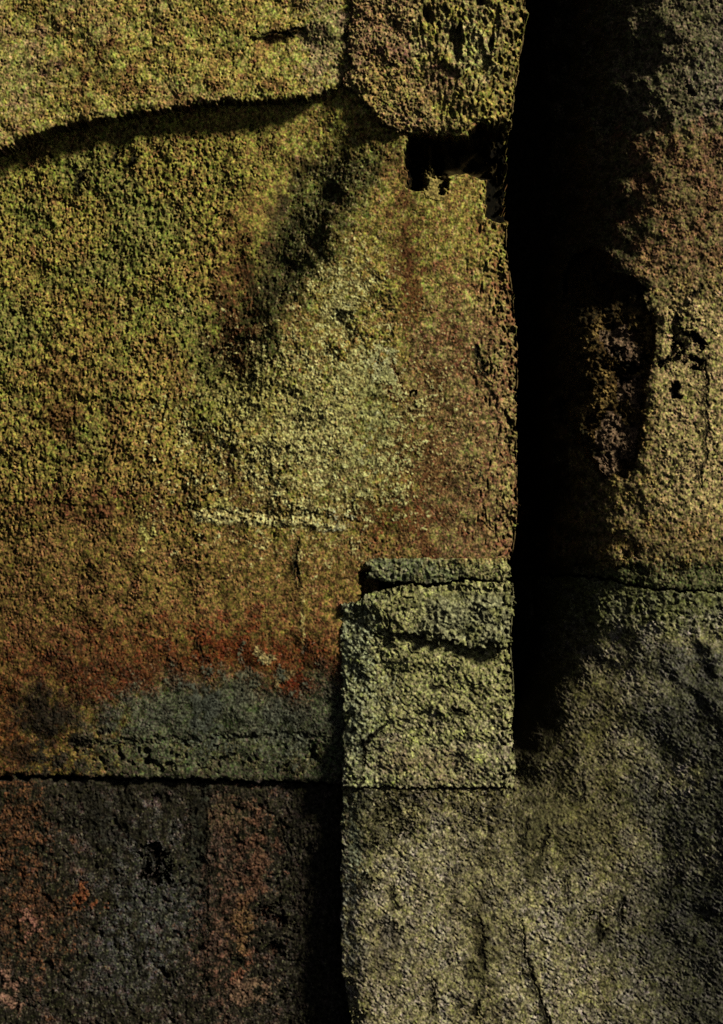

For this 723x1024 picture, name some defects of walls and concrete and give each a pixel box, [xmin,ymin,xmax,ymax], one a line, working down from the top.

spalling [405,127,509,223]
corrosion [0,601,344,1024]